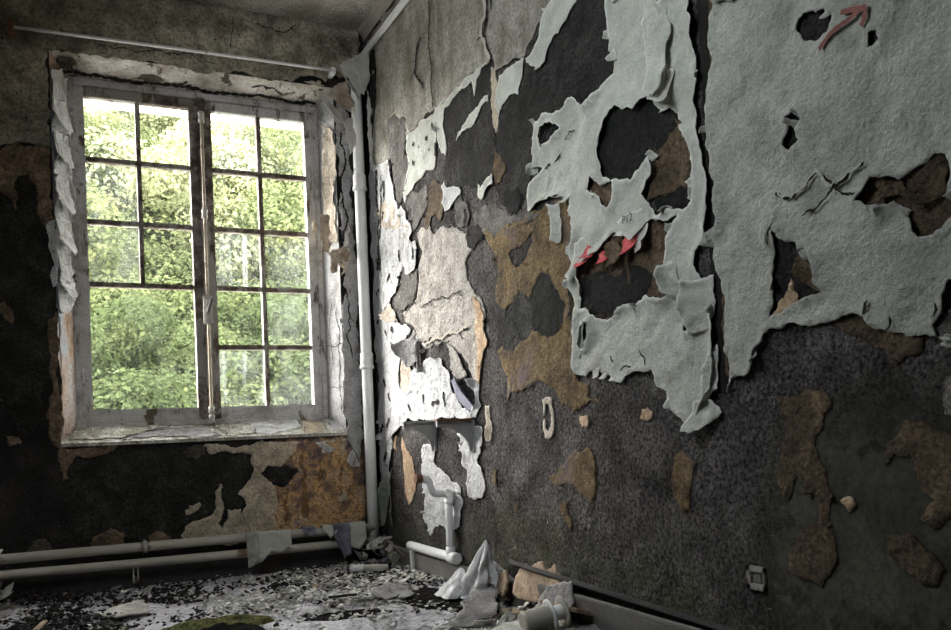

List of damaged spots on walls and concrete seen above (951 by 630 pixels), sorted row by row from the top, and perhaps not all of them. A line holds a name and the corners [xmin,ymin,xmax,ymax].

peeling [0,0,364,545]
peeling [420,425,485,535]
peeling [364,0,951,487]
crack [773,162,864,216]